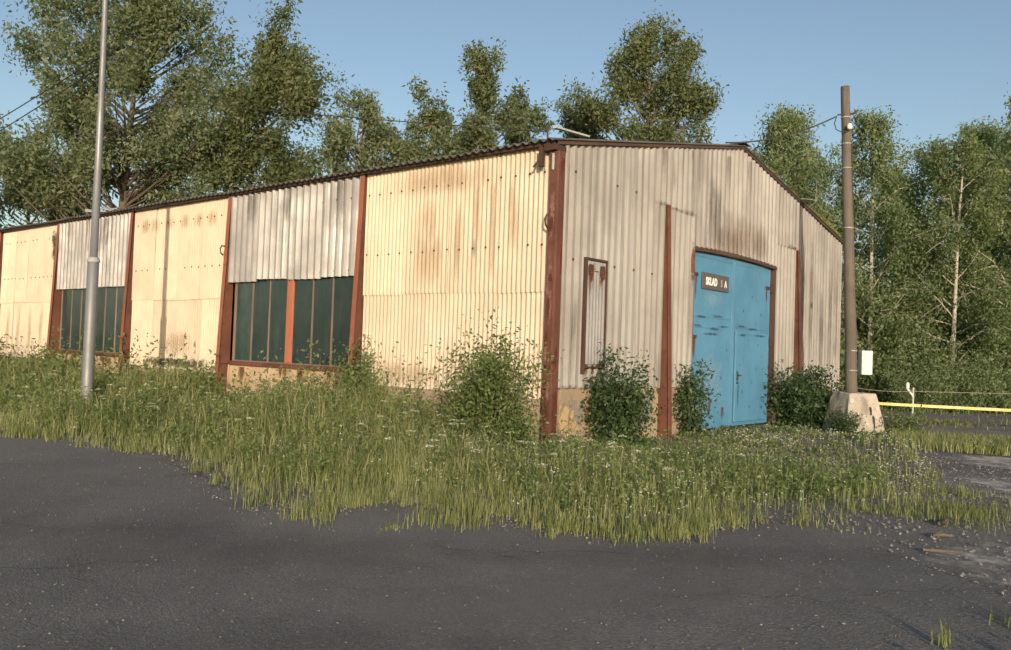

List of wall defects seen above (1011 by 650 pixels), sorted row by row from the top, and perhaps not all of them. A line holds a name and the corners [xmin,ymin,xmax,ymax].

rust [542,392,557,434]